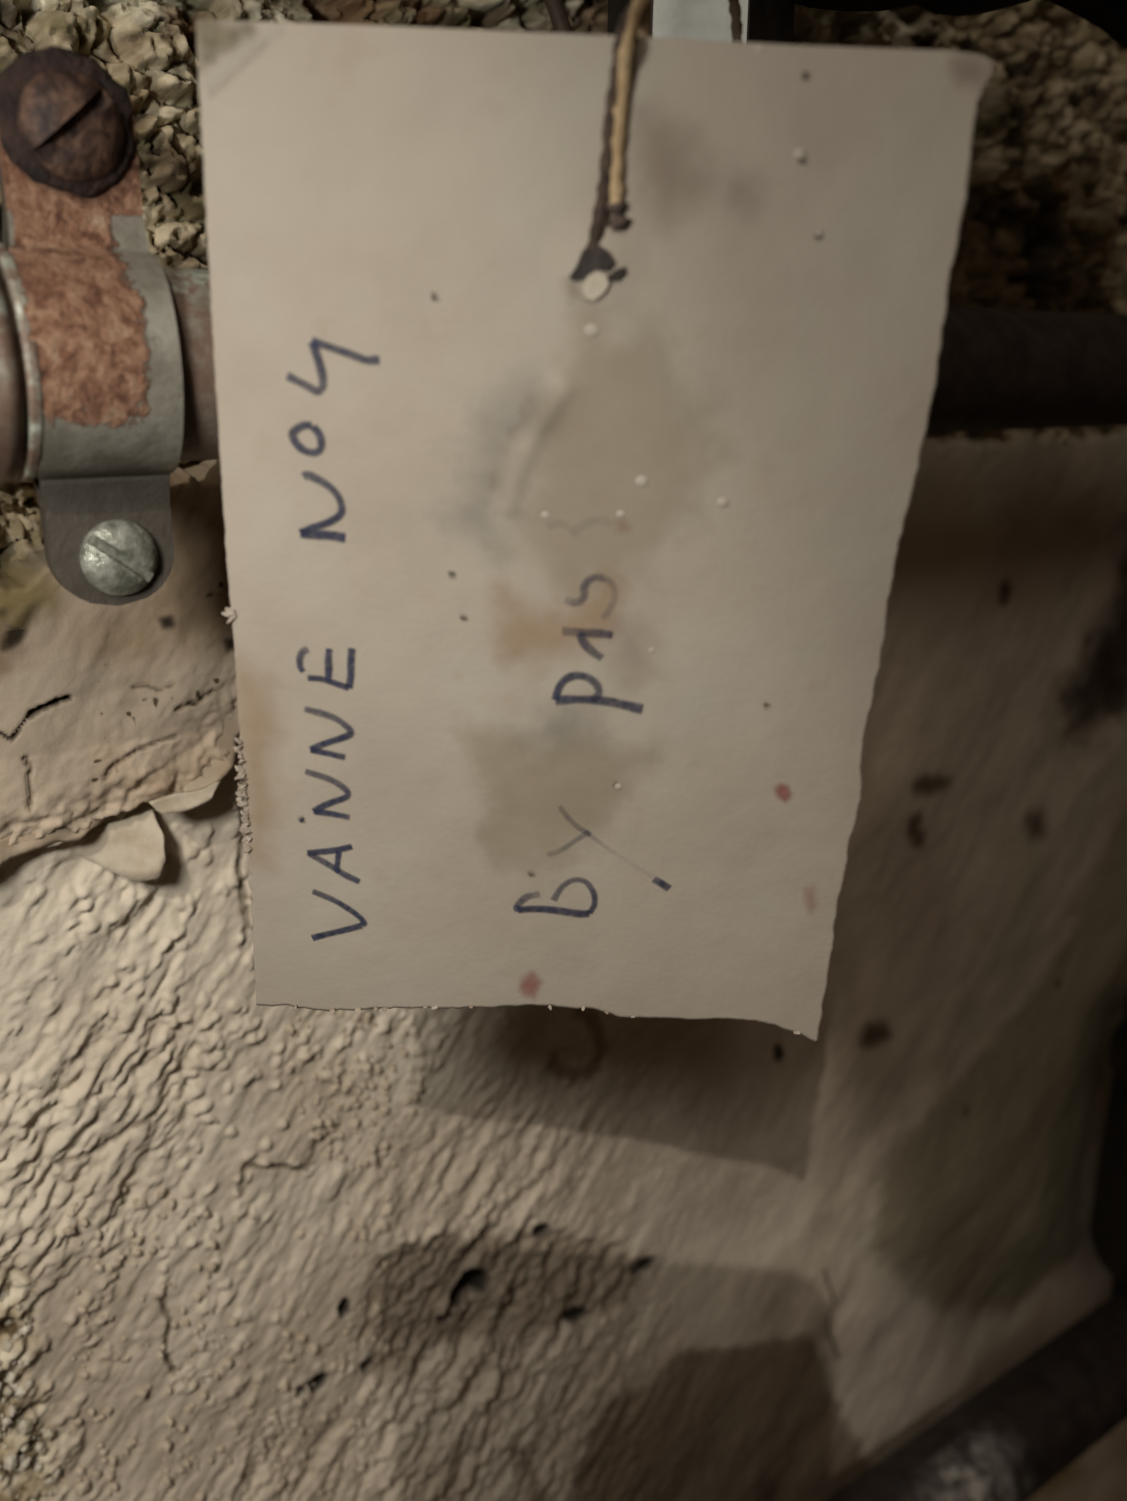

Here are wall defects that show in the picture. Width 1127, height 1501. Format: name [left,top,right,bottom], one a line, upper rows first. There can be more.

crack [0,695,70,740]
flaking render [0,702,240,881]
leakage [1064,560,1127,728]